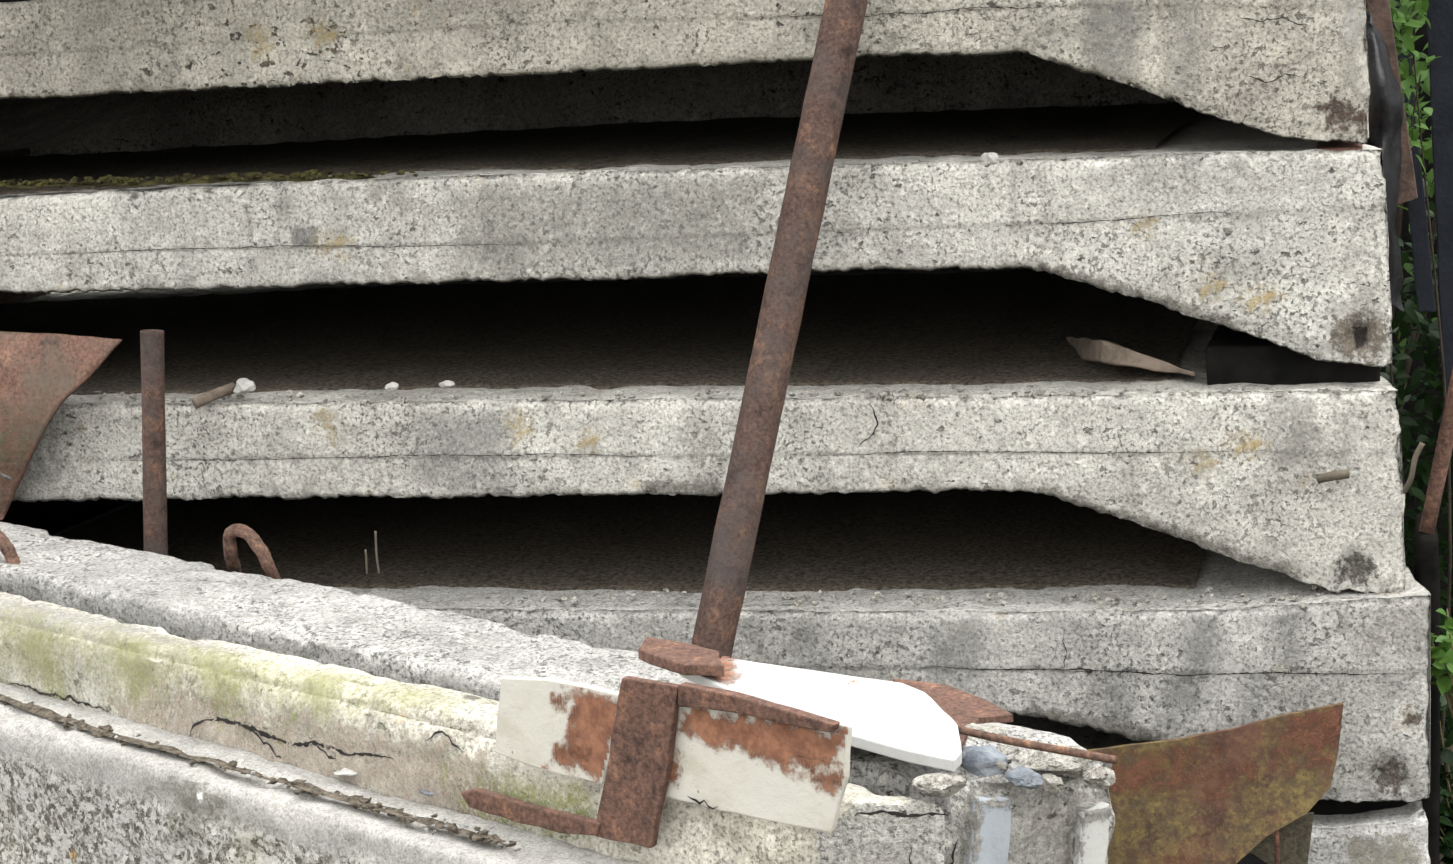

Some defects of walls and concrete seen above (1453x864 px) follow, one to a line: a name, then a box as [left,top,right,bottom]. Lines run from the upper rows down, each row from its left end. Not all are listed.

crack [9,683,111,712]
crack [189,717,393,759]
crack [425,731,462,751]
crack [854,810,958,864]